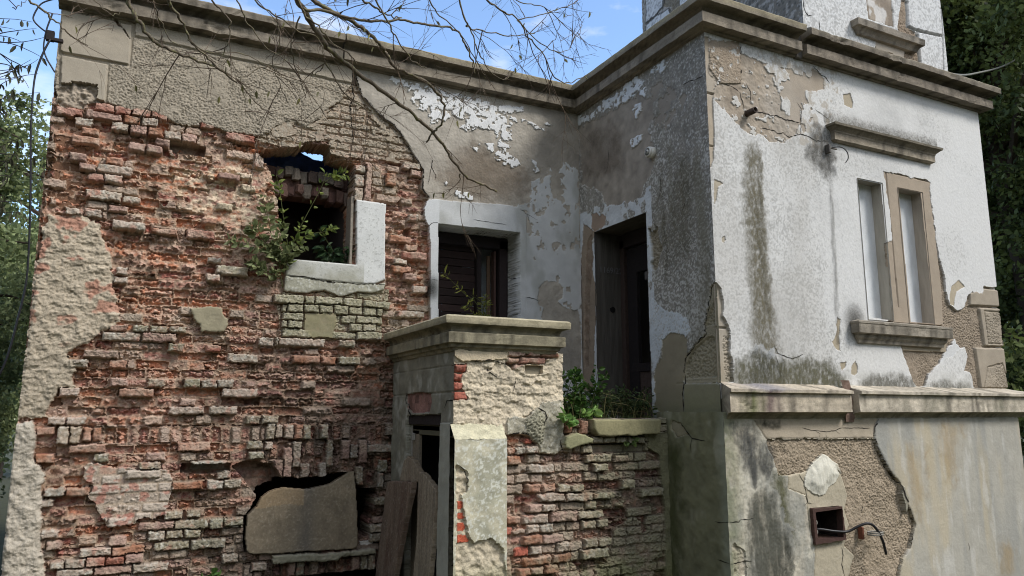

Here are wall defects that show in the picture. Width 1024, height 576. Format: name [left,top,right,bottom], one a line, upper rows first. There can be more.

spalling [49,80,277,318]
spalling [240,338,394,421]
peeling [385,59,667,433]
crack [678,281,715,447]
water stain [743,148,777,350]
peeling [703,36,825,204]
spalling [888,215,1002,388]
spalling [36,386,167,552]
spalling [180,460,282,491]
spalling [455,459,549,576]
water stain [738,428,793,576]
spalling [767,437,916,576]